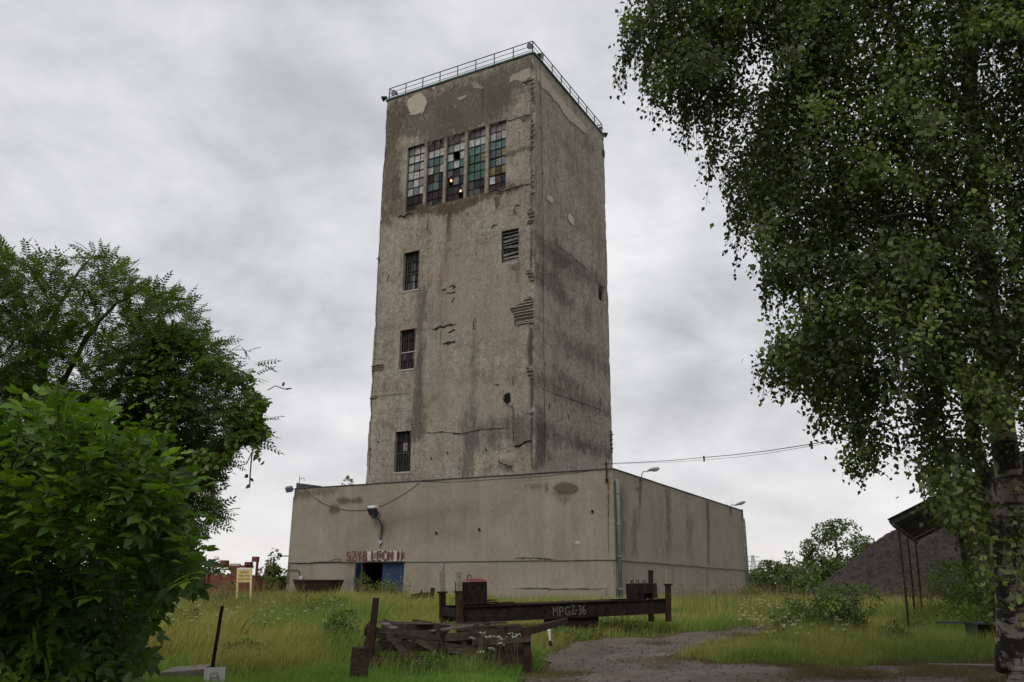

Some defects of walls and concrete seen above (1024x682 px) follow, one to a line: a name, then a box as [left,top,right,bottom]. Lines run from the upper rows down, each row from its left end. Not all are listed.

spalling [407,87,435,116]
spalling [509,68,587,133]
spalling [510,296,534,325]
damp [411,215,611,477]
crack [426,378,532,451]
damp [294,490,362,512]
damp [546,482,578,502]